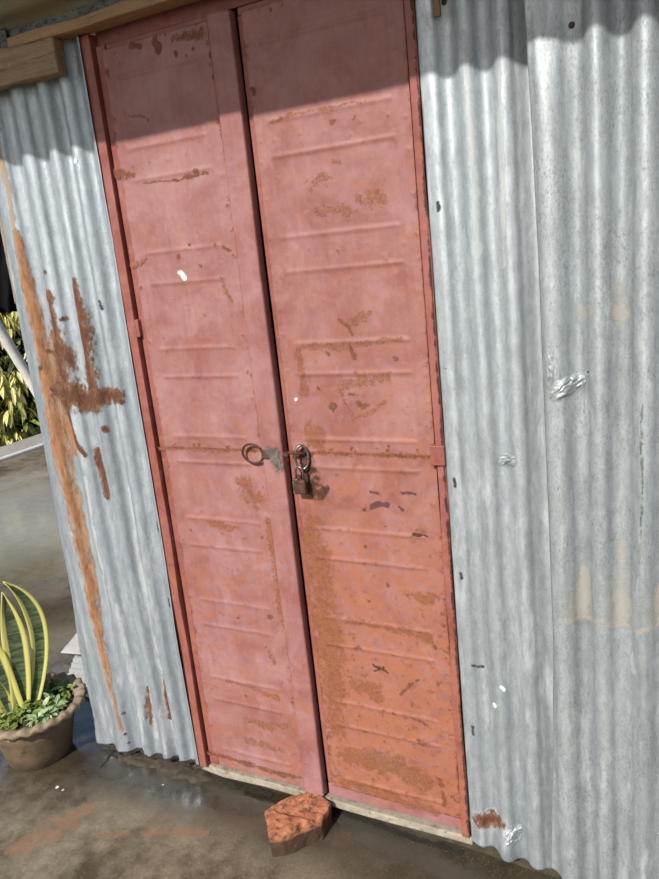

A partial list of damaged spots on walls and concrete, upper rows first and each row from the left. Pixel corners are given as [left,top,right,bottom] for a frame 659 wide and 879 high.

rust [410,0,427,215]
rust [0,147,130,744]
rust [294,348,308,395]
rust [297,423,329,500]
rust [427,226,443,446]
rust [145,686,159,739]
rust [335,747,446,816]
rust [443,466,505,833]